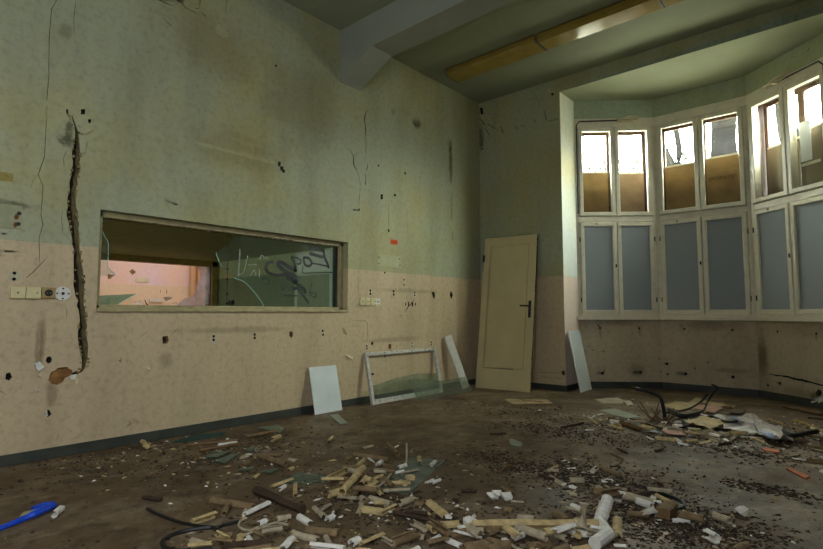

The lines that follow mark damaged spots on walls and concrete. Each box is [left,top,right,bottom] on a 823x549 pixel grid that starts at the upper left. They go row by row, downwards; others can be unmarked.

crack [29,77,93,374]
flaking render [34,356,79,385]
crack [770,374,823,386]